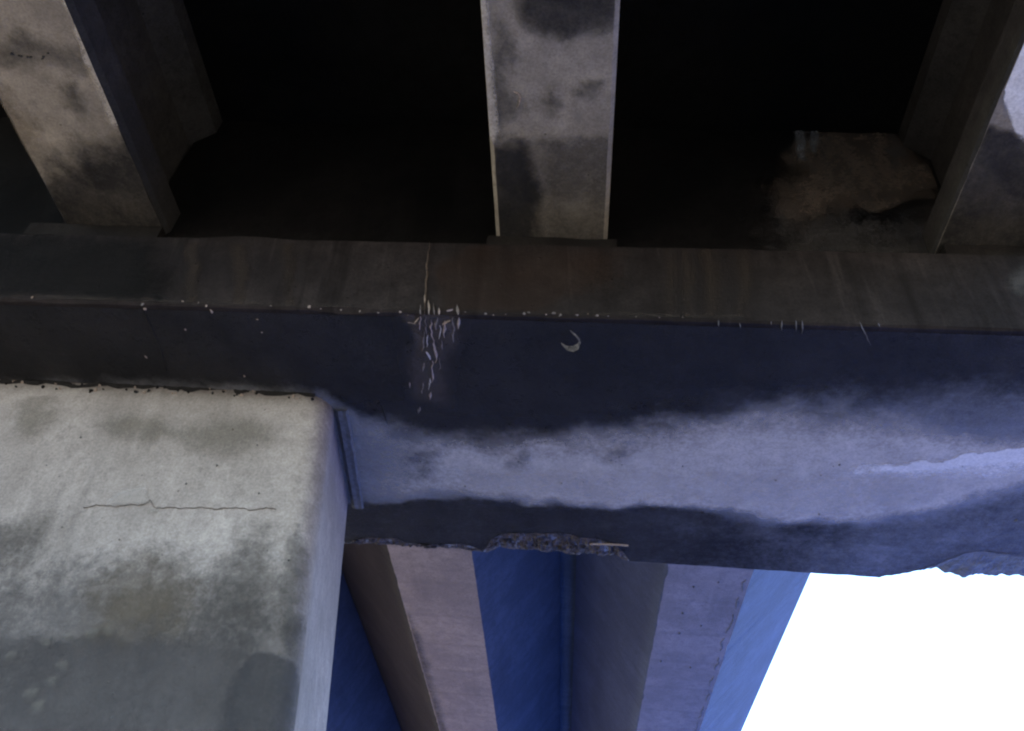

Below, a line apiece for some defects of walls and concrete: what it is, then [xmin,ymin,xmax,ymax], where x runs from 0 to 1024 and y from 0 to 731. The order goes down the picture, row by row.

crack [423,243,431,315]
efflorescence [399,295,466,399]
crack [83,489,275,511]
water stain [368,413,1024,522]
spalling [350,533,628,561]